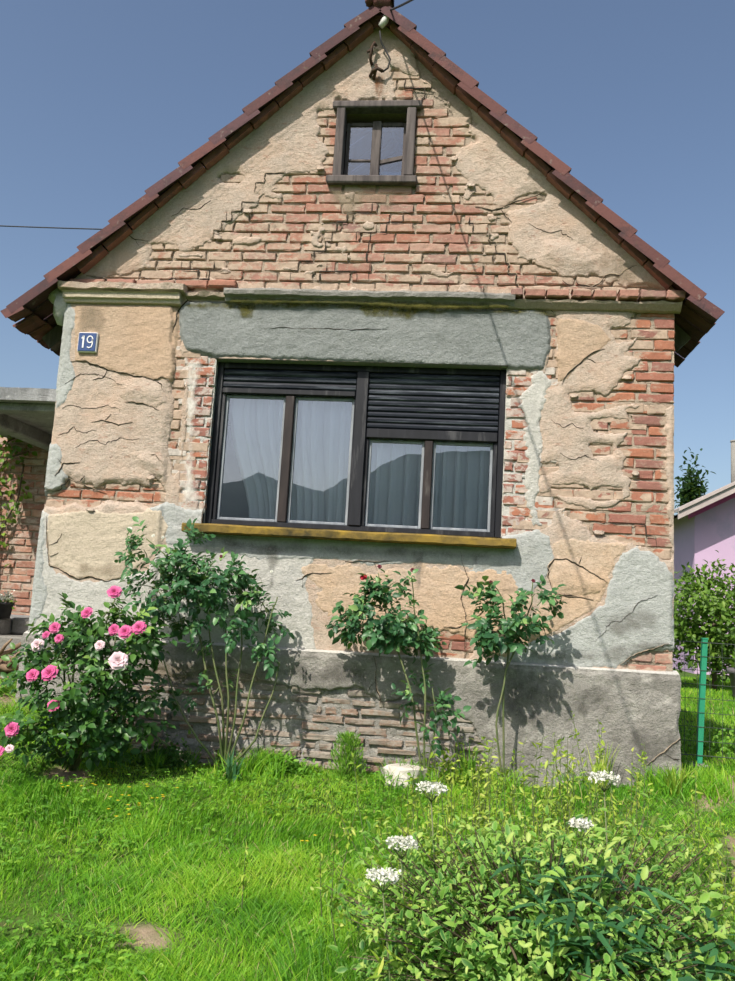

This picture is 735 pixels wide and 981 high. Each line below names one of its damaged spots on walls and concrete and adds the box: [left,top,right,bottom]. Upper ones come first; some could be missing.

spalling [108,58,659,300]
crack [468,191,571,287]
crack [563,264,636,287]
crack [46,360,170,492]
spalling [301,313,675,659]
crack [46,516,121,582]
crack [547,558,606,605]
crack [621,644,664,664]
flaking render [110,666,484,778]